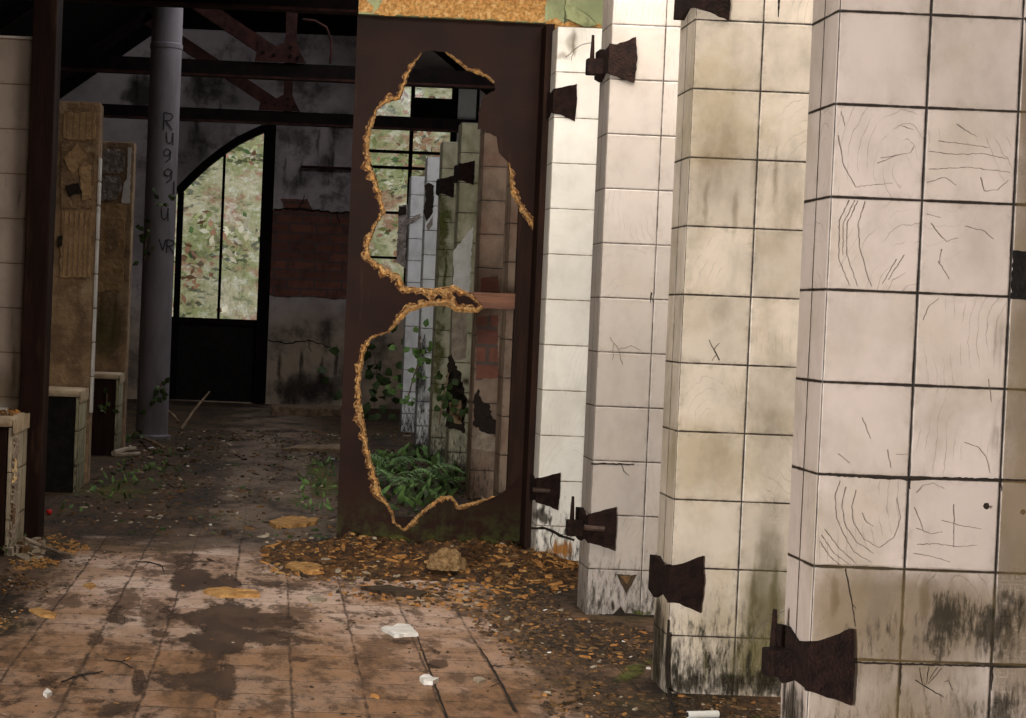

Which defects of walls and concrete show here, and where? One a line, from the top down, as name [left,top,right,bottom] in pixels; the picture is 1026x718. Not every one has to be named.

peeling [358,0,602,29]
flaking render [270,199,349,299]
spalling [453,227,499,292]
crack [838,114,1010,285]
crack [923,214,993,320]
crack [268,340,331,352]
flaking render [445,310,498,452]
crack [820,453,980,627]
leakage [83,553,313,718]
leakage [647,597,664,685]
leakage [670,653,803,718]
leakage [825,585,1026,661]